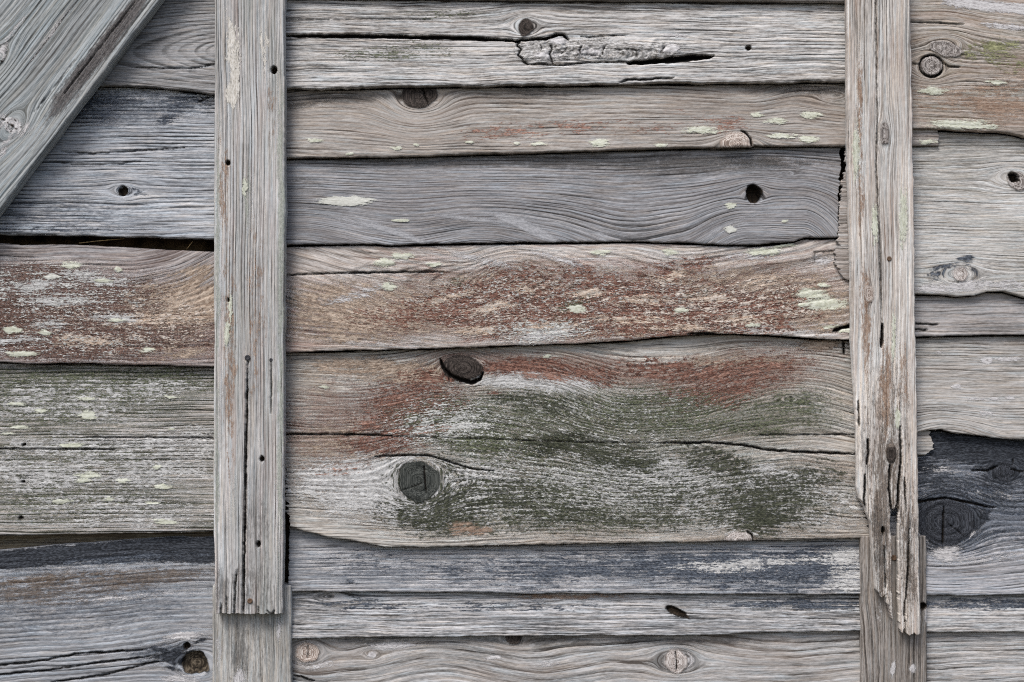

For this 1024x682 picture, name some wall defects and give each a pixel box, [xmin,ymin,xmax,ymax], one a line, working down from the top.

crack [286,19,713,82]
water stain [857,69,865,236]
crack [220,362,275,614]
crack [286,433,649,492]
water stain [286,249,1024,622]
crack [675,403,987,599]
crack [0,650,158,681]